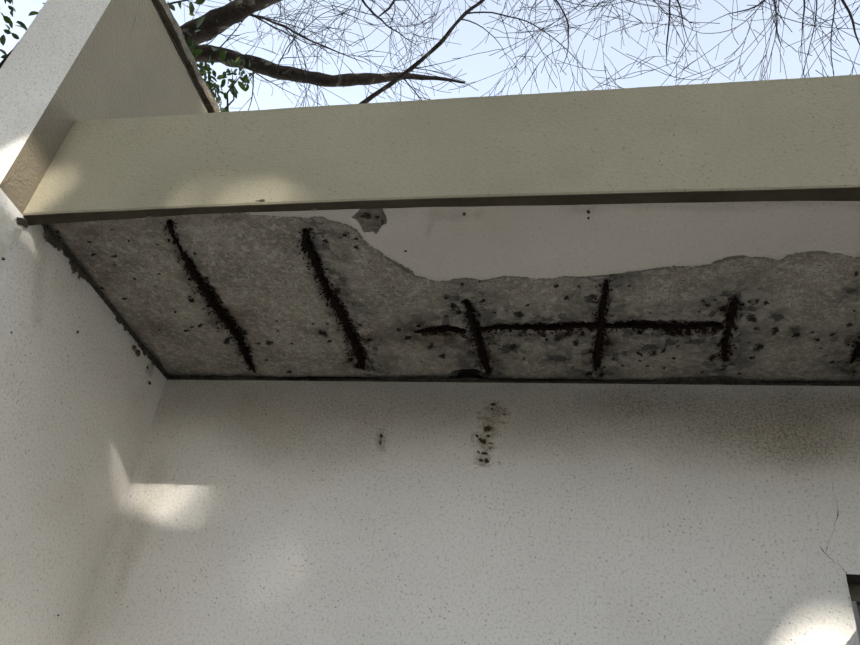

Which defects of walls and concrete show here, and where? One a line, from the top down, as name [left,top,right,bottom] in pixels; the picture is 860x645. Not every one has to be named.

spalling [16,208,860,383]
crack [45,226,860,386]
corrosion [476,426,493,463]
crack [820,474,847,574]